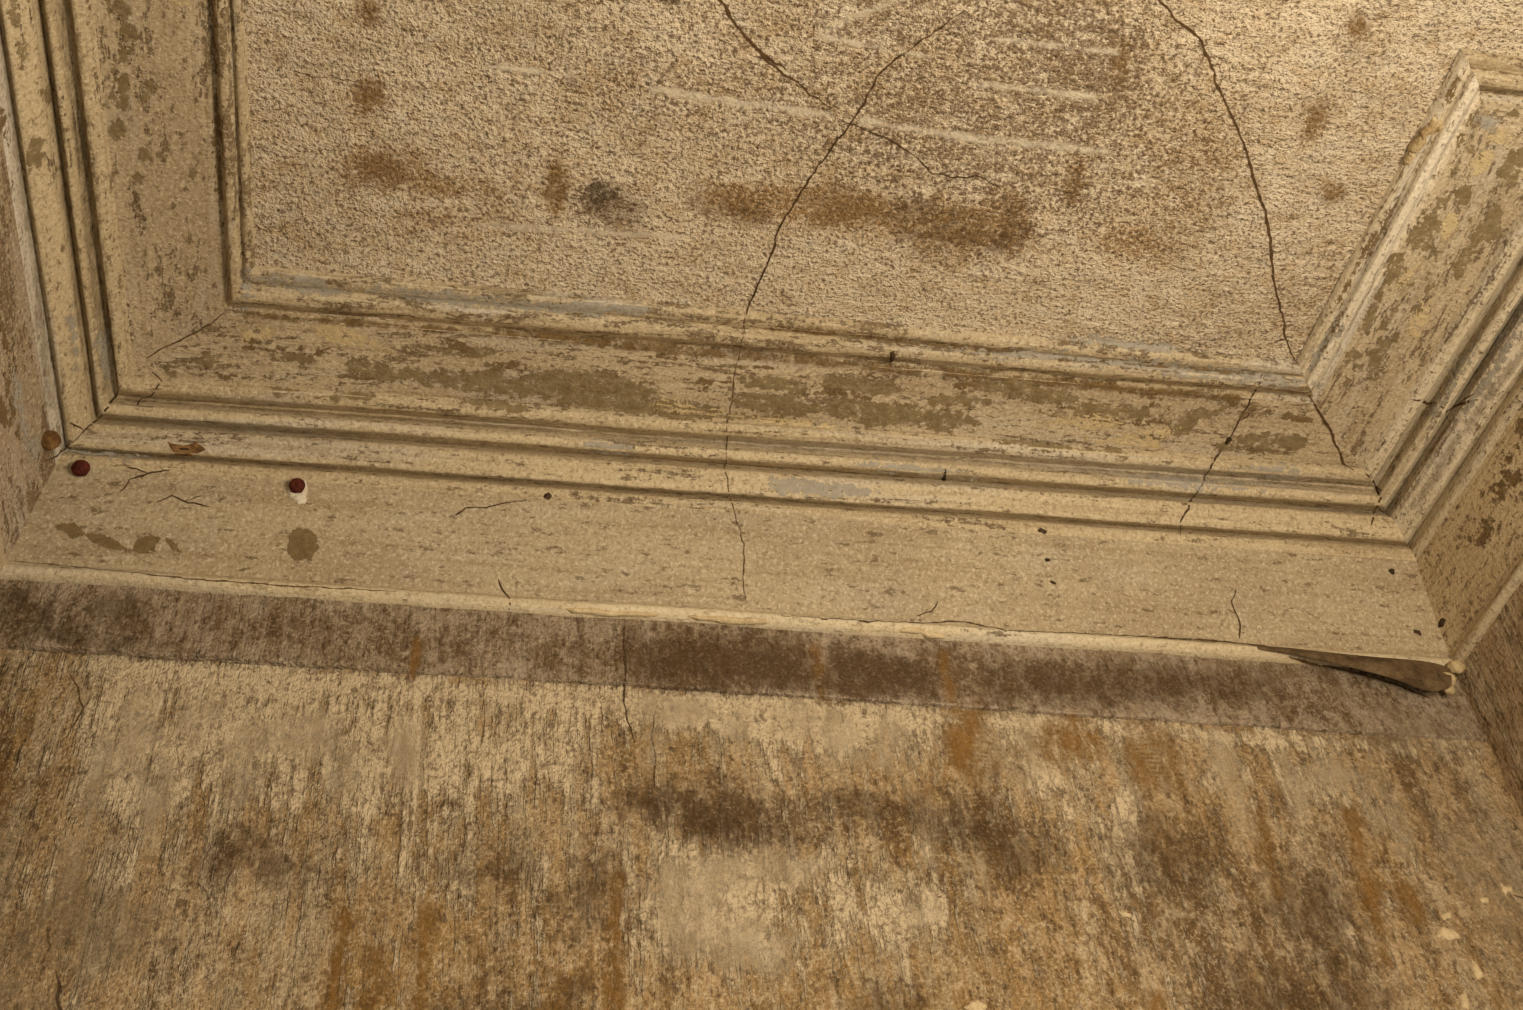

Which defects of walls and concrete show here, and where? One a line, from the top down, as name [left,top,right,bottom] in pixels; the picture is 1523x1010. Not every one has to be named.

peeling [6,0,31,71]
peeling [0,106,47,179]
peeling [101,0,176,199]
peeling [183,0,226,234]
peeling [0,286,44,468]
peeling [65,301,113,390]
peeling [162,70,1523,501]
crack [718,0,999,600]
crack [1158,0,1393,534]
peeling [1459,415,1523,548]
crack [41,926,63,1010]